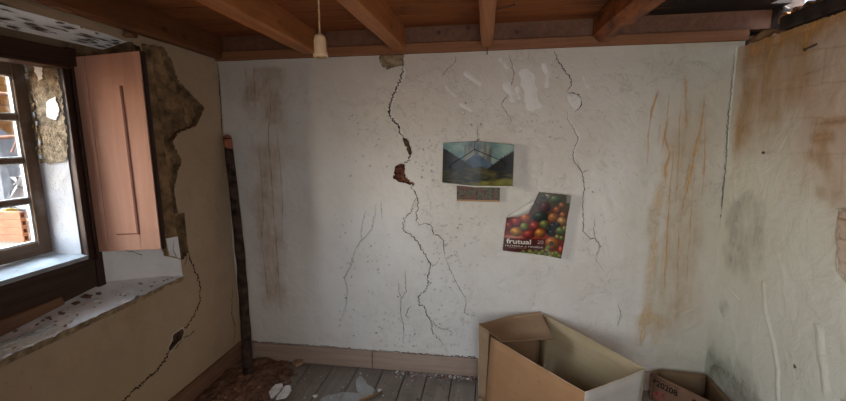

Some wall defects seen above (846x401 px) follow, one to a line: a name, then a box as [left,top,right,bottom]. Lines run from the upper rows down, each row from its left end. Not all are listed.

flaking render [0,8,205,261]
crack [387,66,411,163]
flaking render [385,137,440,187]
crack [554,50,606,271]
crack [123,246,202,401]
crack [231,185,476,358]
flaking render [835,211,846,283]